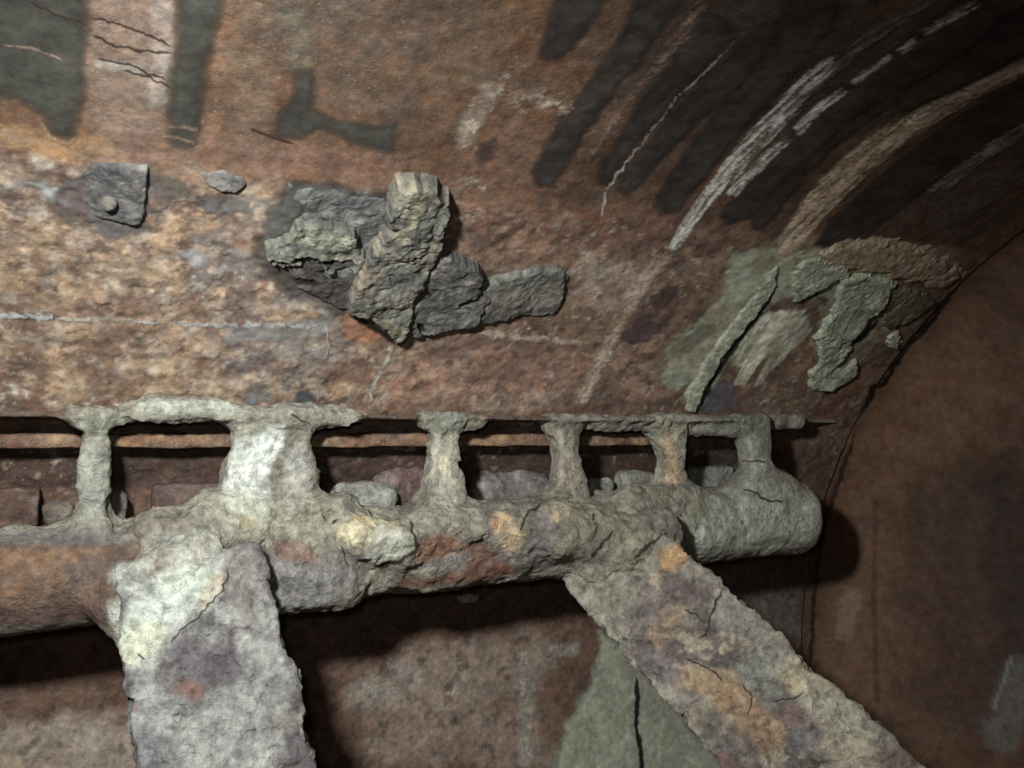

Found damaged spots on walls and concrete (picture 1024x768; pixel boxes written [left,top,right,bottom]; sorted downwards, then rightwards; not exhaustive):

crack [4,45,62,60]
leakage [0,0,88,145]
crack [31,2,170,88]
leakage [162,0,221,147]
leakage [276,70,395,152]
leakage [531,0,680,186]
leakage [575,0,1024,414]
crack [634,679,644,768]